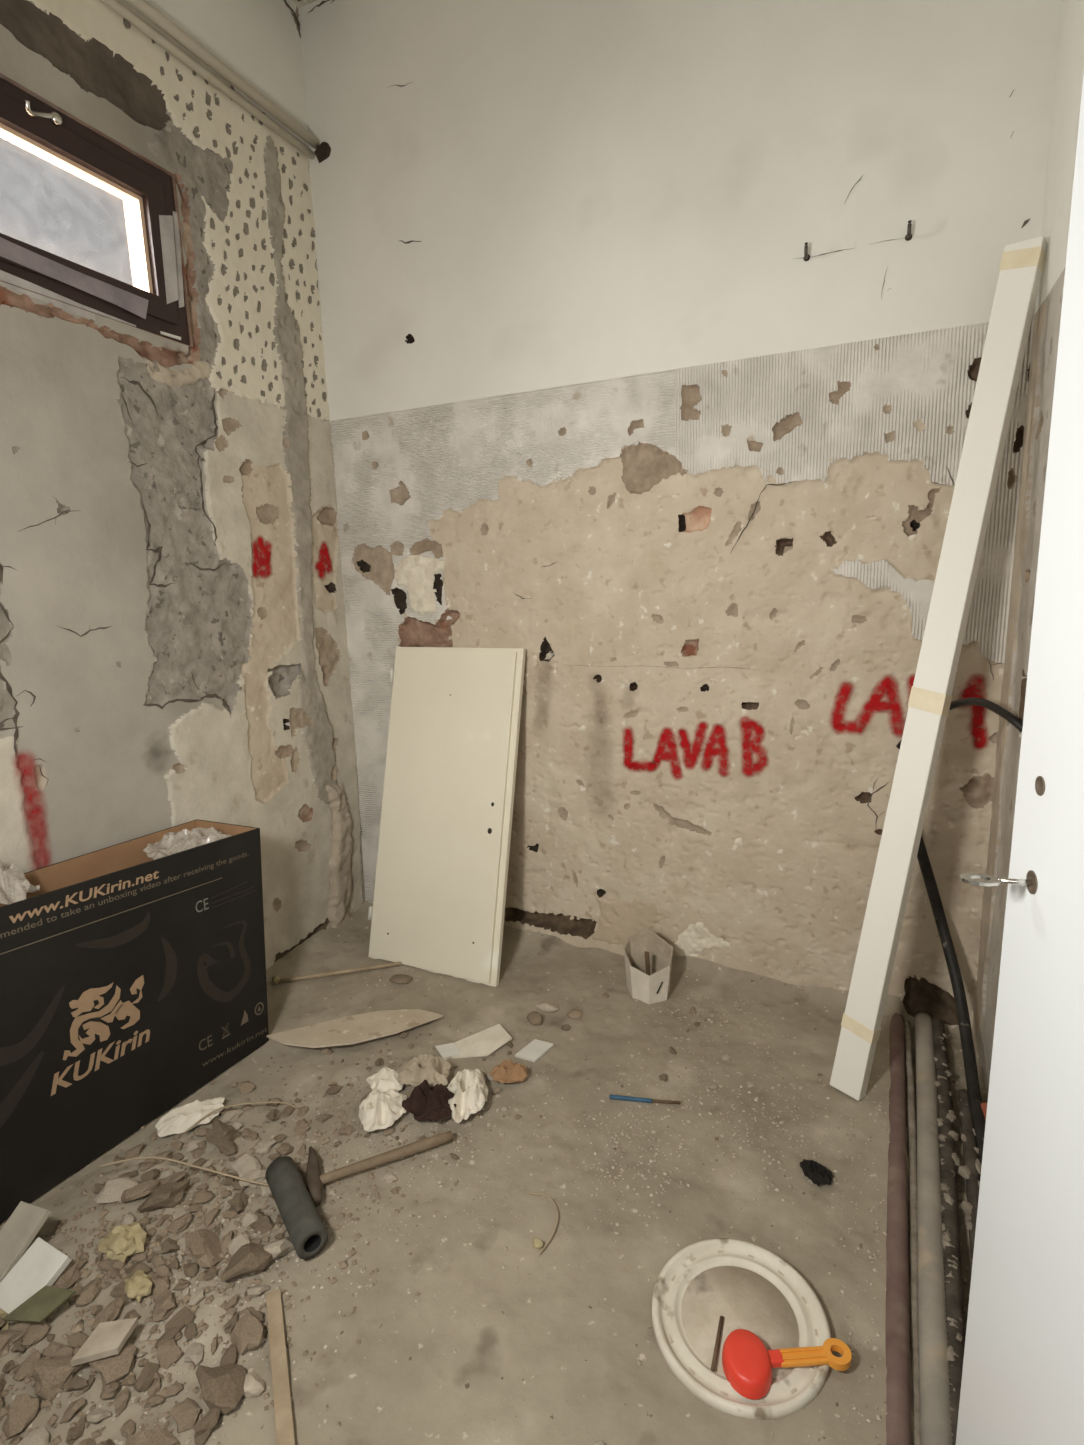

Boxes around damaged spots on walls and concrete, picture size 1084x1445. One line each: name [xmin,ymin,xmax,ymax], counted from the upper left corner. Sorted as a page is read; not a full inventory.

flaking render [967,357,982,382]
spalling [680,384,702,421]
spalling [829,380,851,405]
flaking render [946,402,972,434]
flaking render [200,417,242,461]
crack [20,497,70,531]
crack [0,563,49,787]
spalling [223,412,954,991]
spalling [888,641,1004,1029]